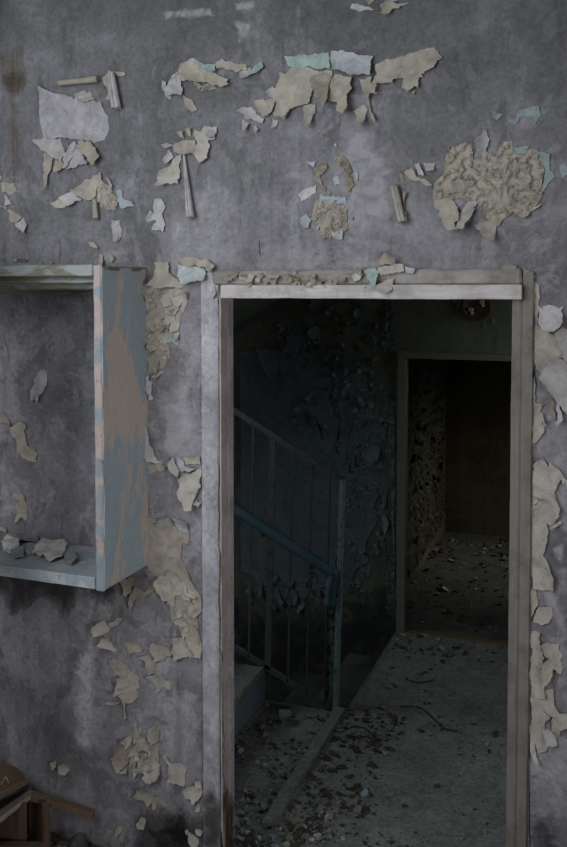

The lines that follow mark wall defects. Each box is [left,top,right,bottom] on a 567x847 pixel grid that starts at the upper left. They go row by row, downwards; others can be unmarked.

peeling [33,70,125,188]
peeling [162,58,264,112]
peeling [236,47,442,133]
peeling [50,172,134,242]
peeling [298,143,358,240]
peeling [144,257,215,400]
peeling [30,370,48,402]
peeling [0,410,38,463]
peeling [407,359,447,586]
peeling [501,264,567,764]
peeling [91,426,203,812]